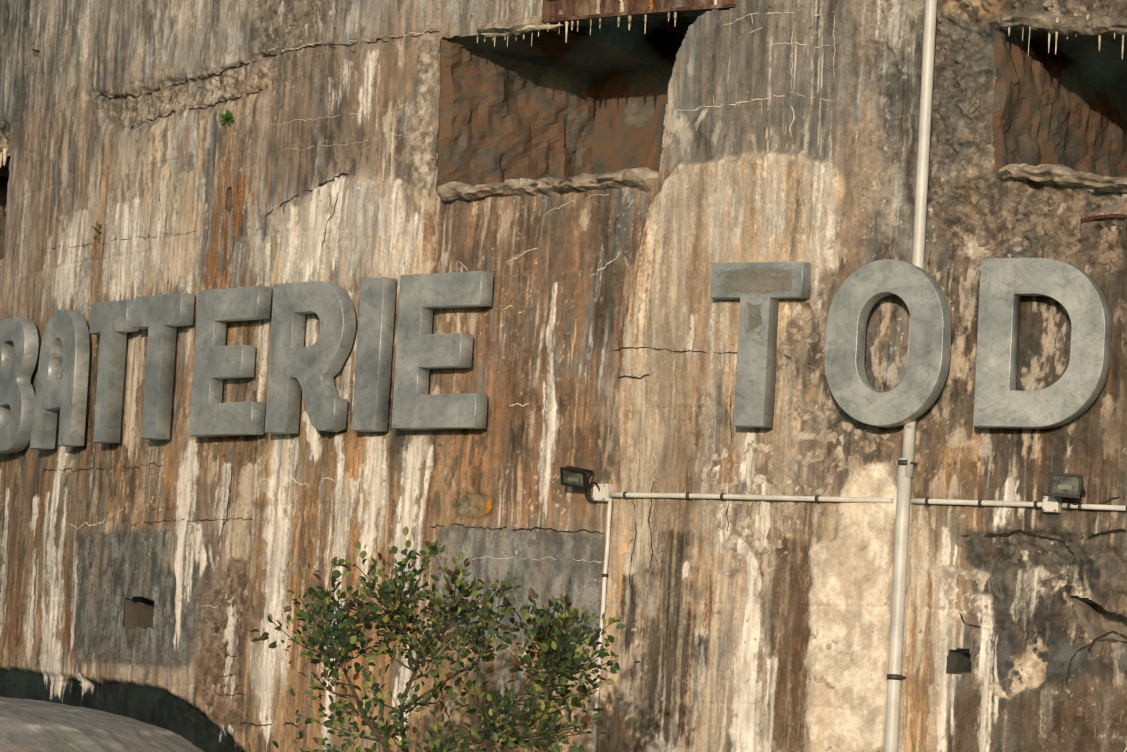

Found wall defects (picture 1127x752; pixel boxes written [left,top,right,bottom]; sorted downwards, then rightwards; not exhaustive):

spalling [93,0,333,129]
crack [265,173,349,249]
spalling [407,35,440,194]
crack [666,9,836,136]
spalling [930,33,1124,271]
damp [118,329,165,522]
damp [238,319,270,402]
damp [612,129,813,752]
damp [0,446,93,698]
damp [159,333,433,752]
corrosion [281,490,322,750]
spalling [937,525,1127,699]